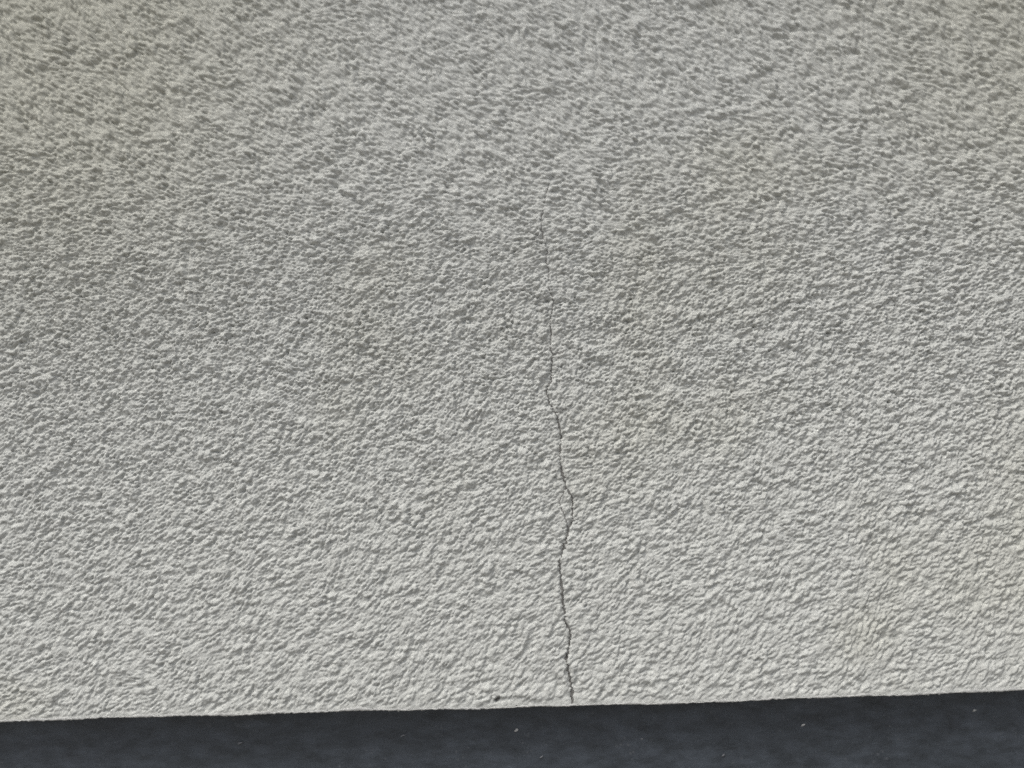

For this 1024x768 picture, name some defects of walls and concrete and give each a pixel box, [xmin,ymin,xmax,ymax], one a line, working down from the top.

crack [540,182,574,704]